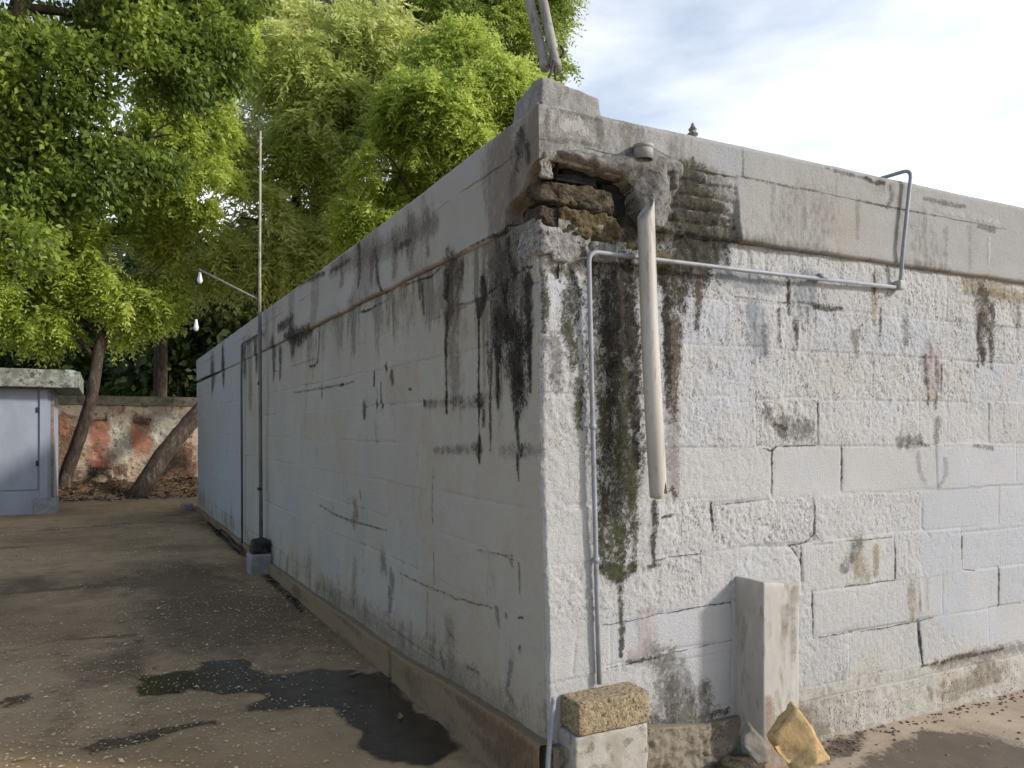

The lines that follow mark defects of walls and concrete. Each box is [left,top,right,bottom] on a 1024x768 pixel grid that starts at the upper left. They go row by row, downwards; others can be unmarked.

spalling [517,107,639,279]
damp [298,241,387,294]
spalling [655,232,678,269]
damp [210,343,225,393]
damp [269,312,302,381]
damp [442,247,464,414]
damp [475,224,584,481]
damp [972,282,1010,371]
flaking render [58,414,76,472]
peeling [75,412,185,482]
flaking render [159,431,197,479]
damp [583,238,730,725]